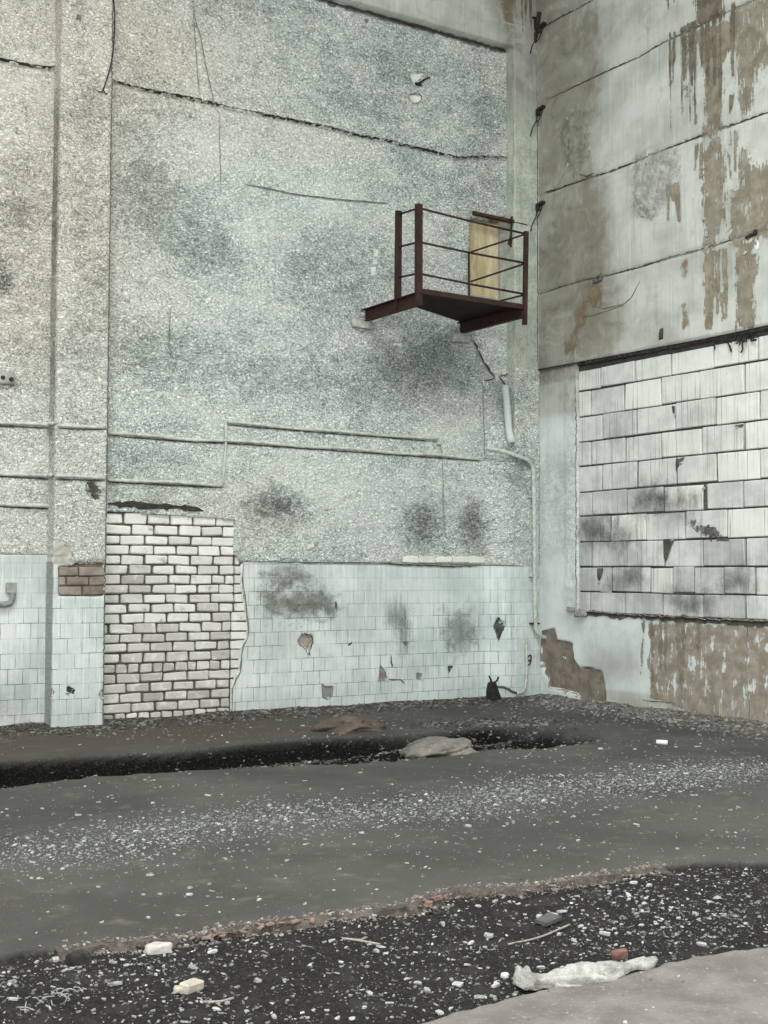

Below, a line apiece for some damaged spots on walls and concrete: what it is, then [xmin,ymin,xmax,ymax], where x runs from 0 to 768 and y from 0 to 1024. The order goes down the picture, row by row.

peeling [665,182,681,221]
peeling [694,123,768,256]
crack [102,0,531,723]
leakage [264,572,336,615]
spalling [298,633,314,656]
spalling [322,684,334,700]
spalling [378,665,389,682]
spalling [493,617,505,642]
spalling [540,628,606,701]
peeling [640,620,768,723]